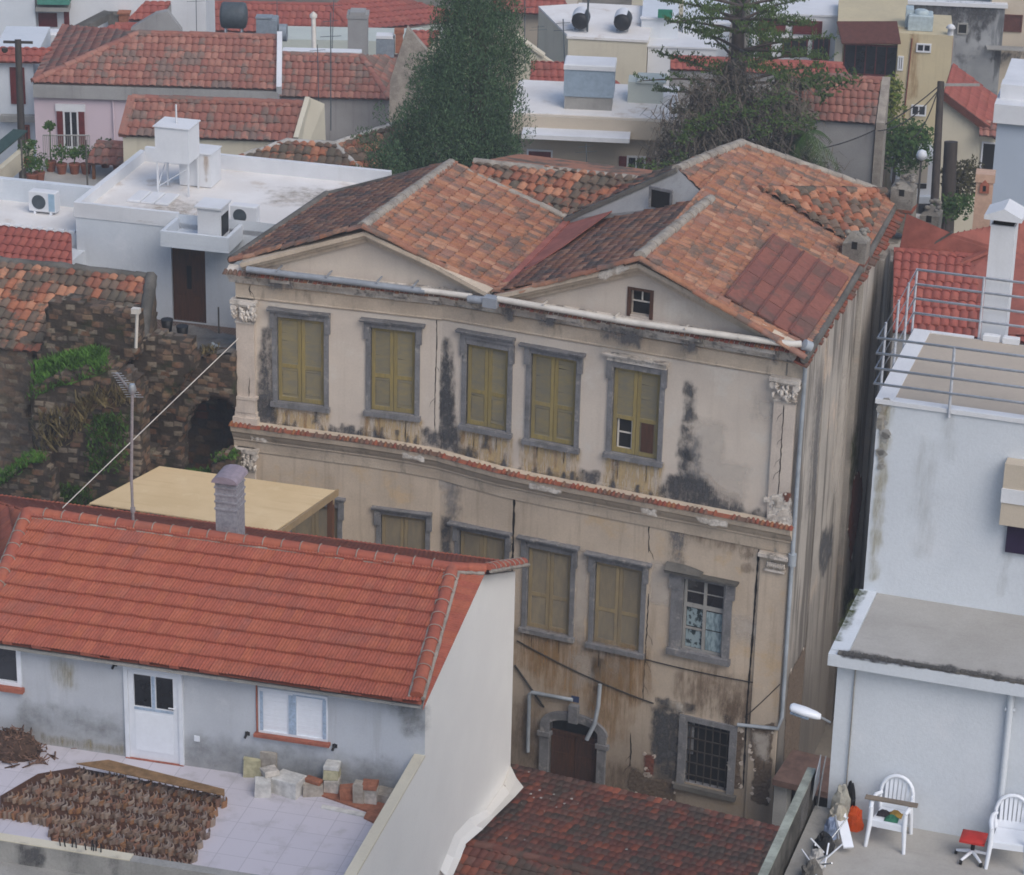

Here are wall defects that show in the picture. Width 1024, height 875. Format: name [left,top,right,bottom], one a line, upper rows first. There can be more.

damp [257,329,277,424]
damp [440,340,460,454]
damp [659,383,767,527]
crack [773,406,784,495]
crack [509,499,517,571]
mould [841,650,1021,681]
damp [651,674,751,781]
flaking render [727,645,806,806]